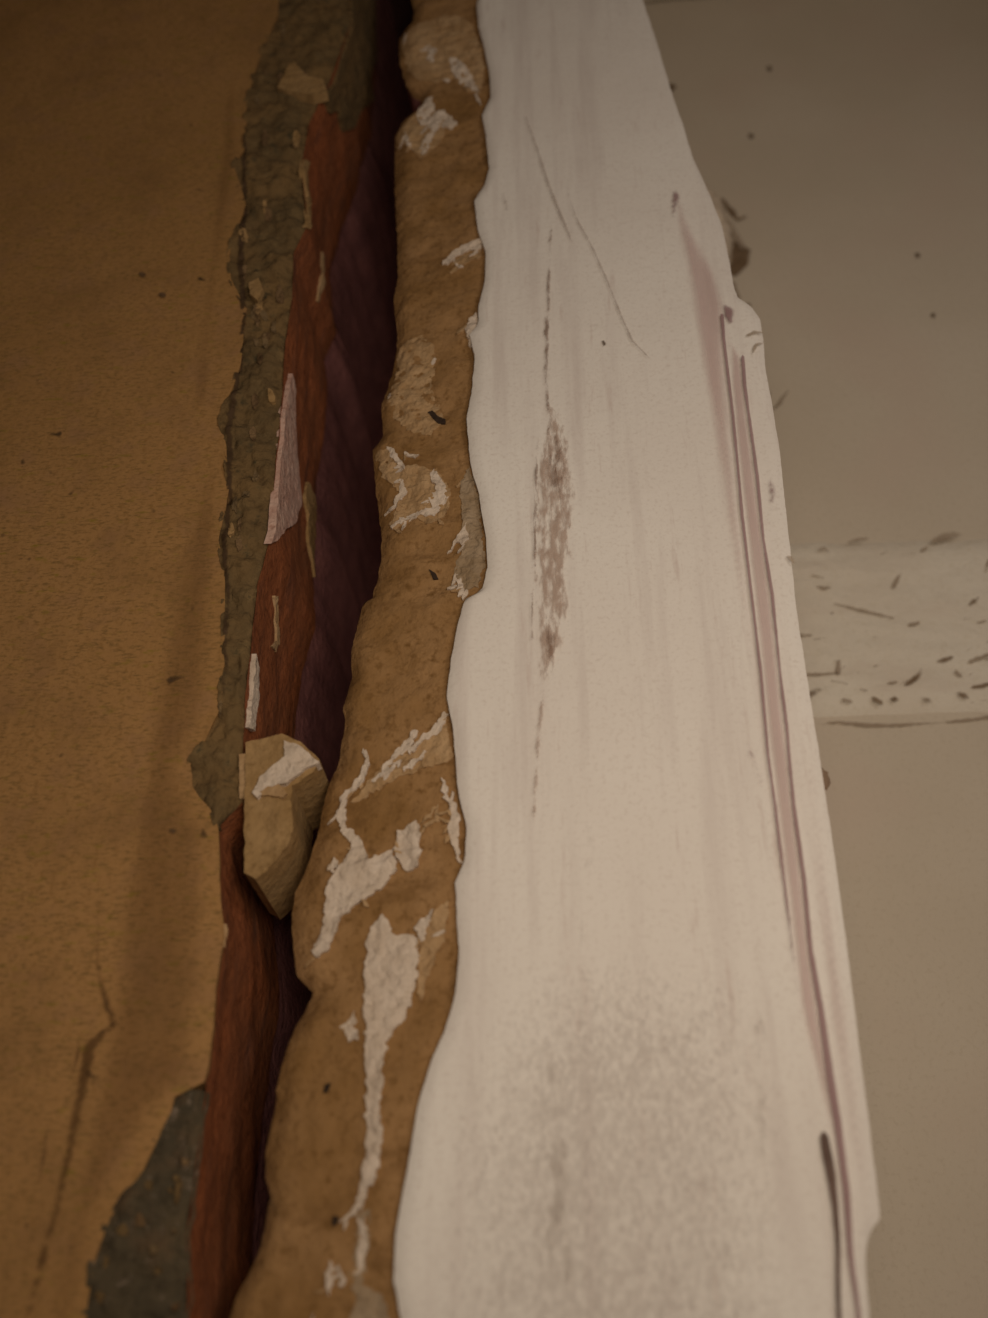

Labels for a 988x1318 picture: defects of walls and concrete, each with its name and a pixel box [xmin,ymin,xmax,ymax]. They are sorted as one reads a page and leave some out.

spalling [187,0,378,832]
spalling [230,0,491,1318]
spalling [721,198,750,306]
spalling [82,1090,210,1318]